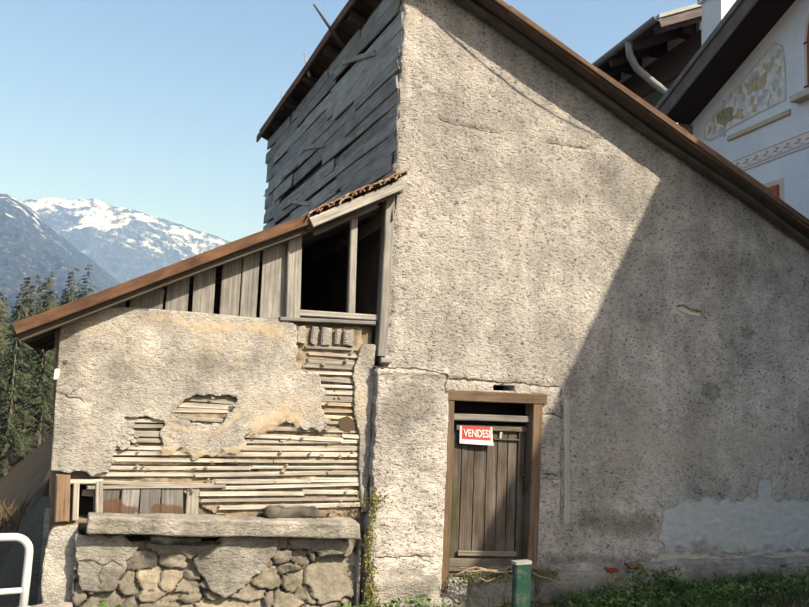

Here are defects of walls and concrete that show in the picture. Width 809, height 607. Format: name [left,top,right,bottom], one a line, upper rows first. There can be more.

peeling [87,326,363,519]
crack [372,365,571,533]